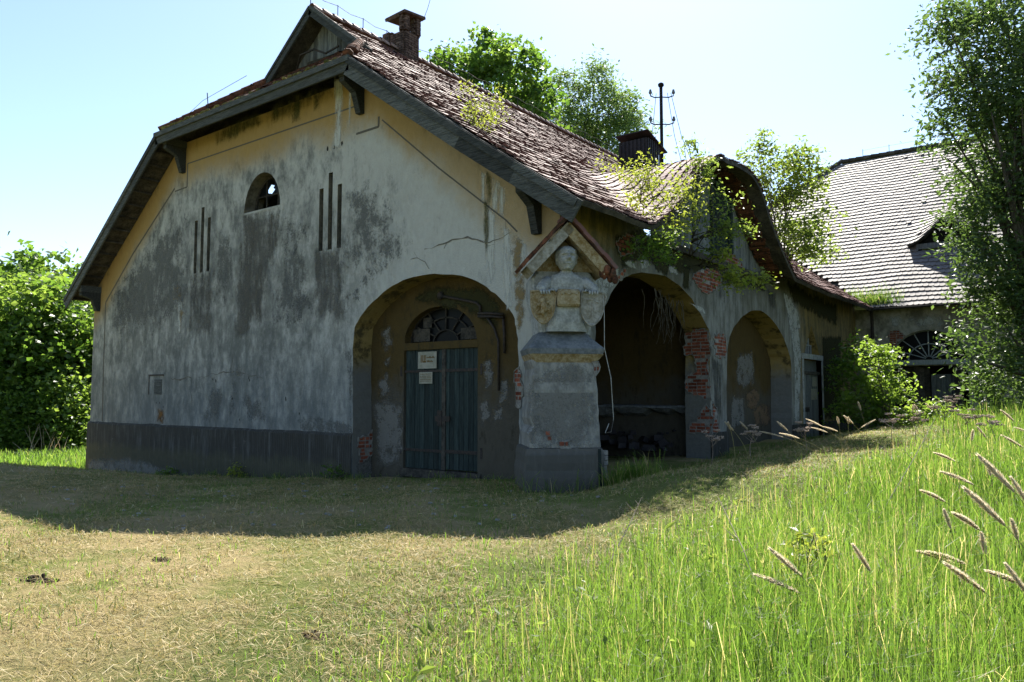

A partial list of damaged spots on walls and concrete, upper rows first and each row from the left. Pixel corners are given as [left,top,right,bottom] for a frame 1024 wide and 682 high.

damp [112,189,400,335]
crack [412,220,511,269]
damp [482,173,526,308]
flaking render [595,232,649,294]
flaking render [692,253,744,314]
flaking render [357,327,403,466]
flaking render [480,361,524,422]
flaking render [683,328,755,435]